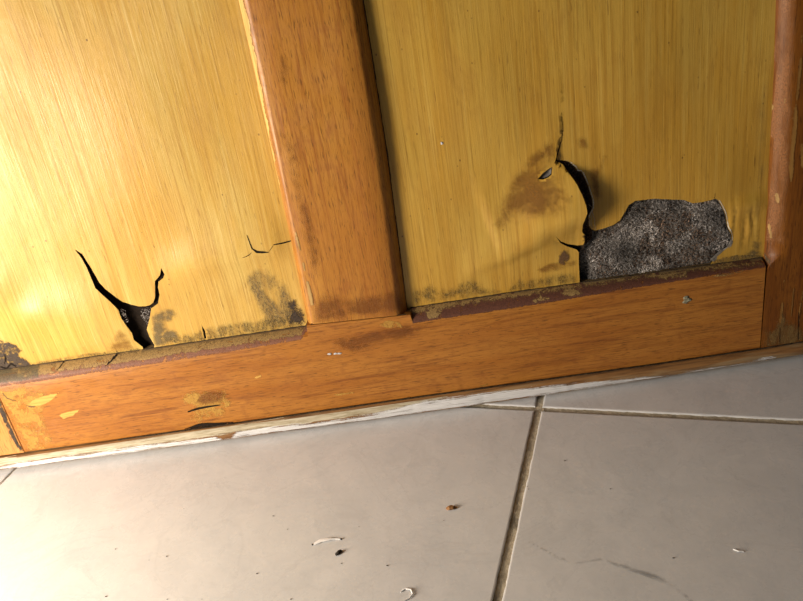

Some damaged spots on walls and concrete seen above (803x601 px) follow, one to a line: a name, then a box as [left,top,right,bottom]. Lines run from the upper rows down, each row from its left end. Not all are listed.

crack [243,236,291,258]
crack [557,238,584,252]
spalling [579,197,733,279]
crack [77,251,164,349]
damp [153,278,304,345]